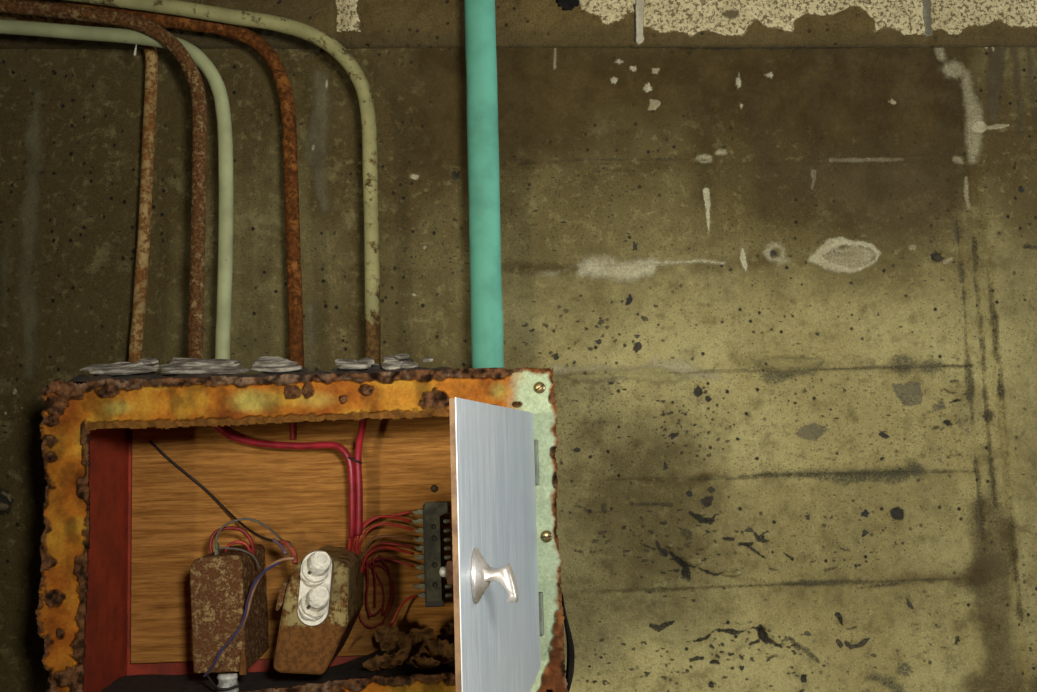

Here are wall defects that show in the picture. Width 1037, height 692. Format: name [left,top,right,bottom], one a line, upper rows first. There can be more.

peeling [336,0,361,32]
peeling [579,0,1037,36]
leakage [809,237,881,273]
leakage [740,465,921,485]